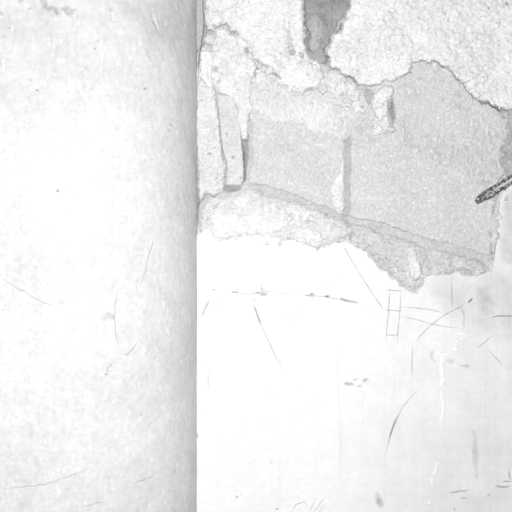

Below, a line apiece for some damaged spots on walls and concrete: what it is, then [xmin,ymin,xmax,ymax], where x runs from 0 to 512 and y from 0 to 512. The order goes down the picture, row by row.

spalling [196,0,512,293]